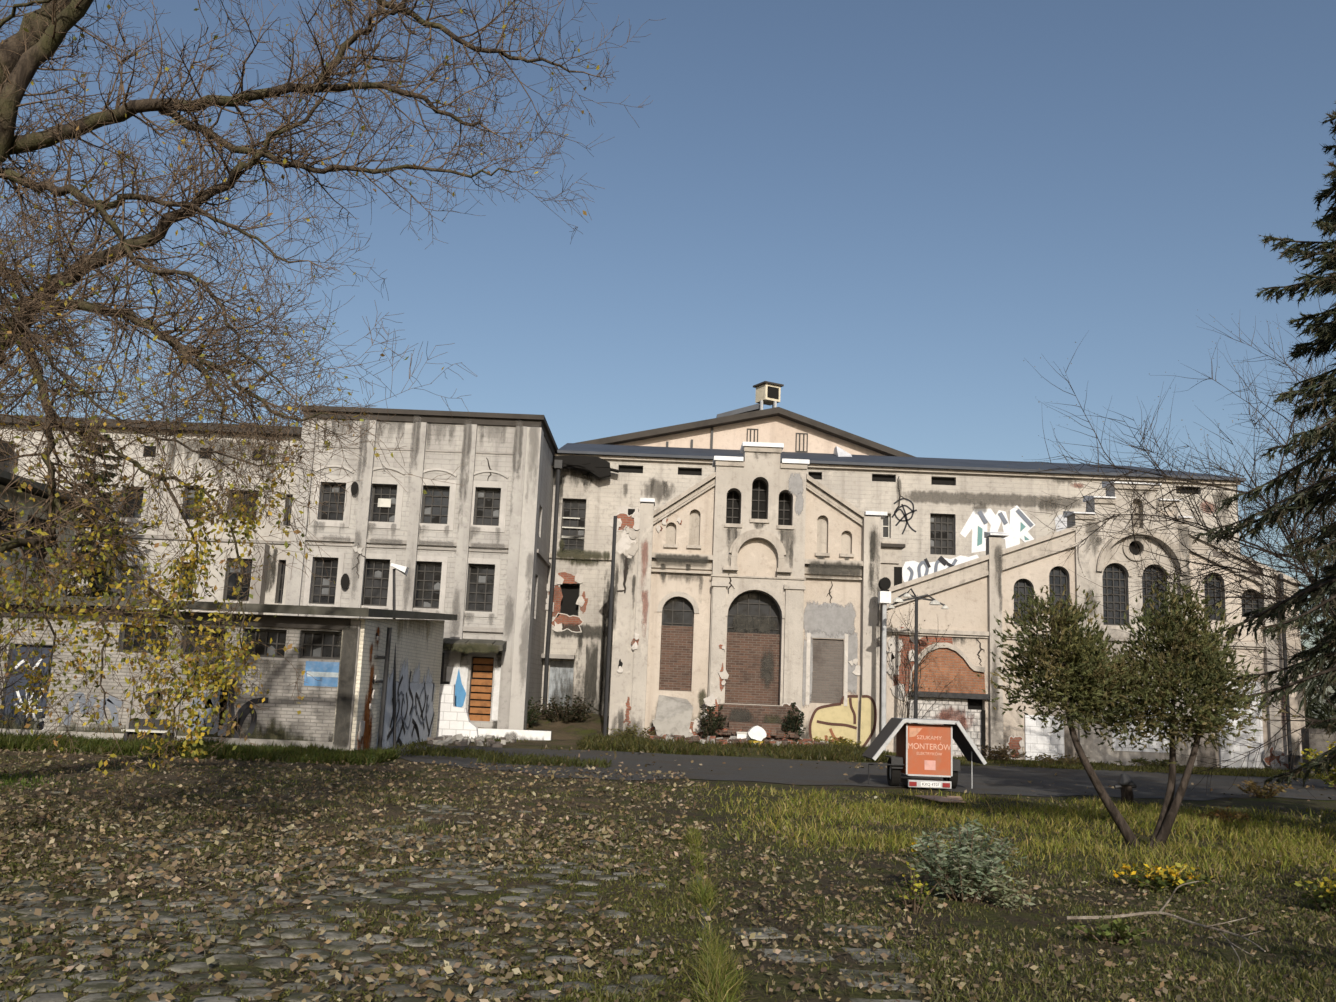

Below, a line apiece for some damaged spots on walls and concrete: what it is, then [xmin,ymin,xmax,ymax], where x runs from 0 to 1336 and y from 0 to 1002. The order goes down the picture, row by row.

flaking render [608,510,640,558]
spalling [545,572,588,633]
corrosion [362,627,380,751]
spalling [886,626,986,701]